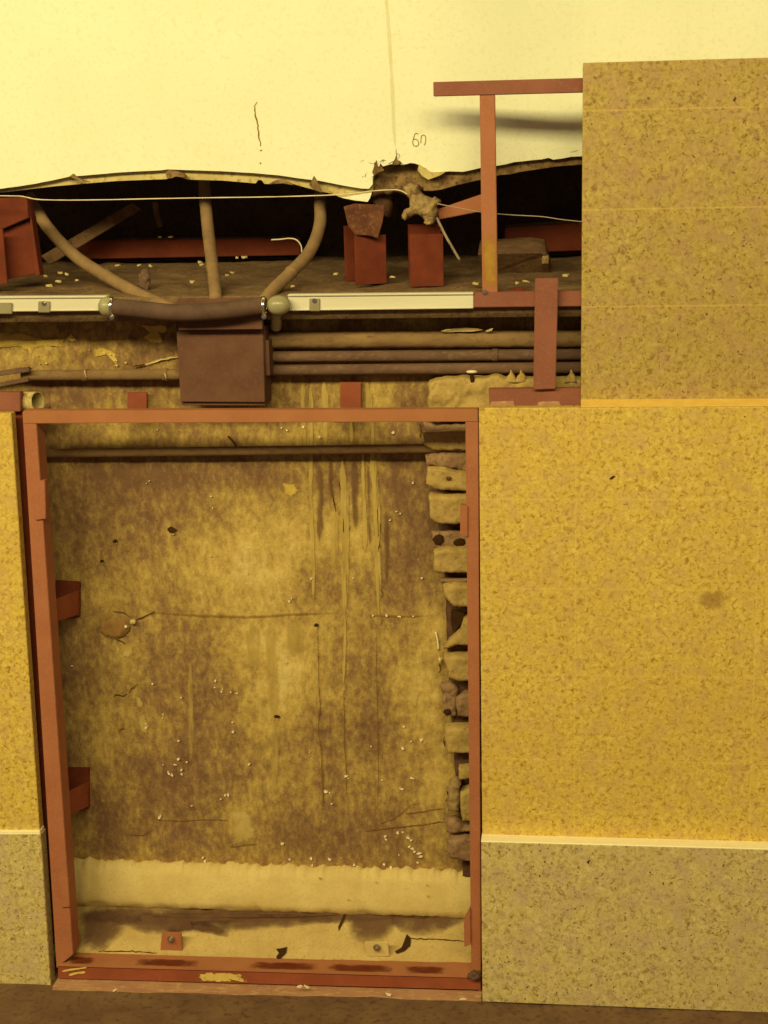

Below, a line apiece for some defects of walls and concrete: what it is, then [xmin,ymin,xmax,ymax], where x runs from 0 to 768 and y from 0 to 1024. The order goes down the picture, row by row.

spalling [0,157,481,218]
spalling [496,156,582,176]
leakage [301,382,329,408]
leakage [299,422,388,682]